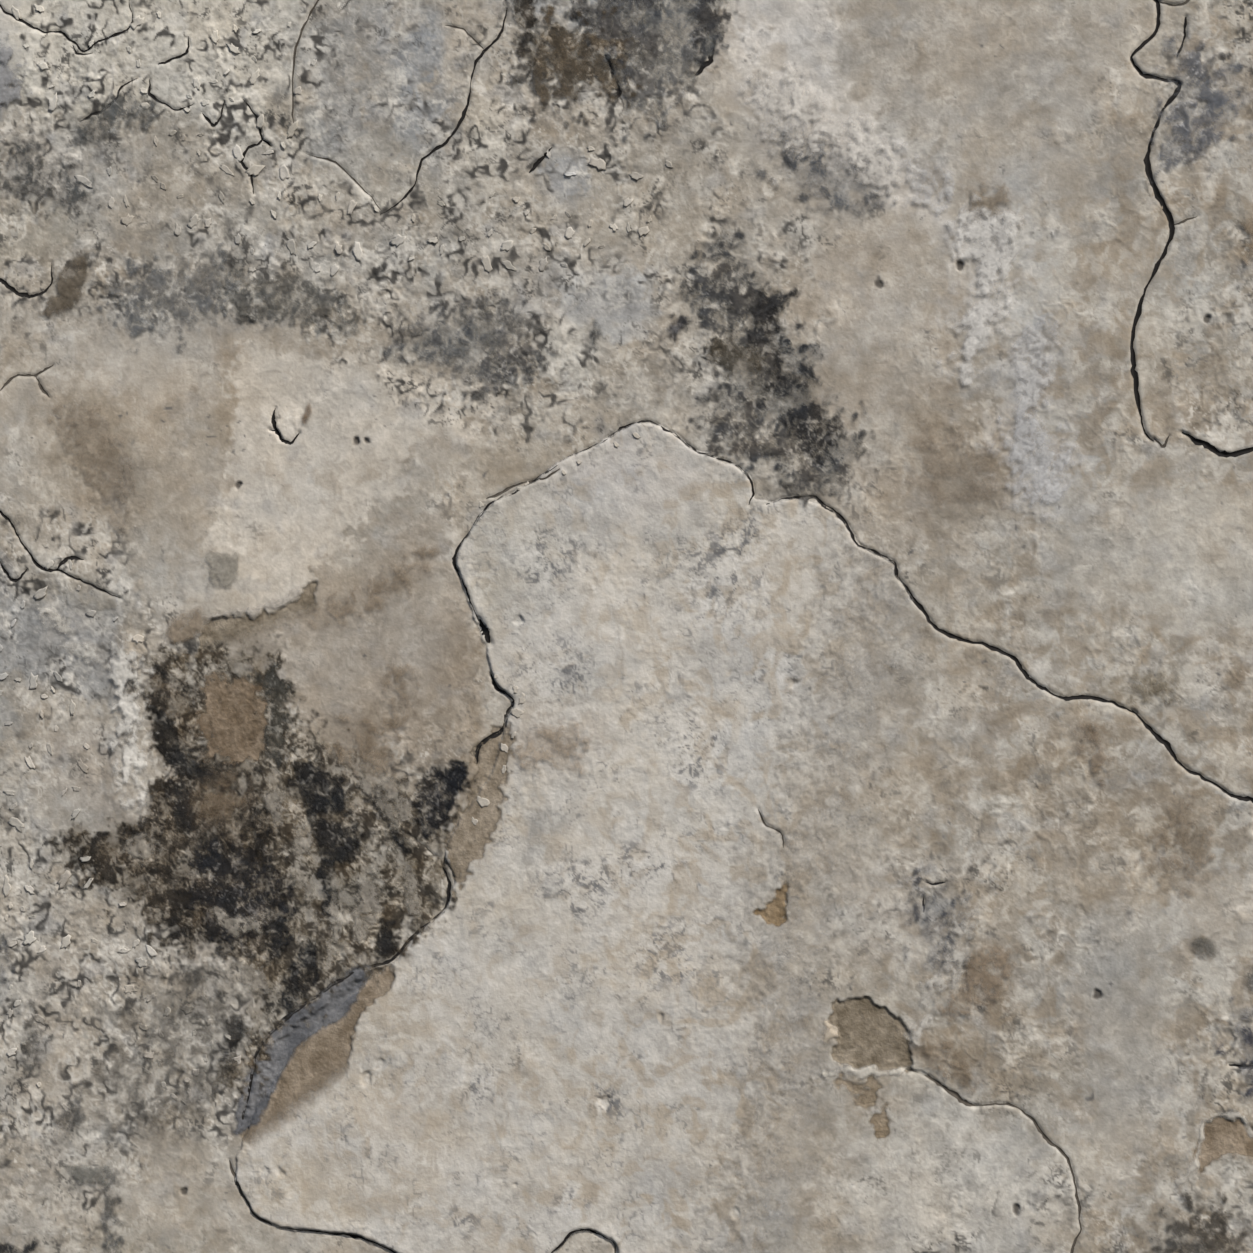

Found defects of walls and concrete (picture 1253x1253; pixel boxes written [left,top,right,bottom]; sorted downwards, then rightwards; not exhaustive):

crack [308,7,508,214]
damp [500,0,732,136]
crack [1130,0,1253,457]
damp [669,230,866,505]
crack [0,511,120,598]
crack [452,420,1253,803]
peeling [119,939,157,968]
damp [50,609,476,1129]
flaking render [232,423,929,1253]
damp [51,1081,86,1141]
peeling [143,1035,231,1104]
crack [229,1160,396,1253]